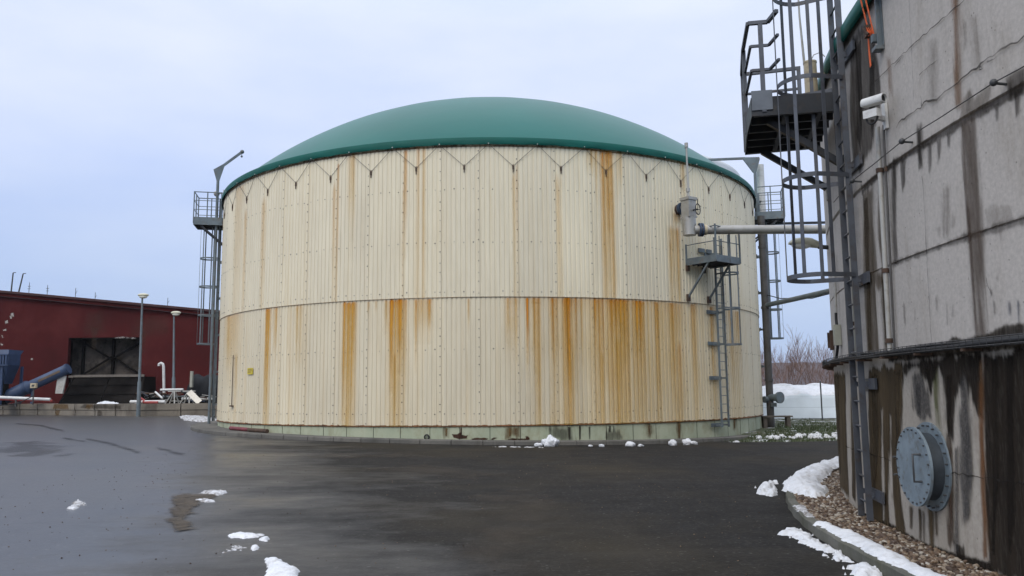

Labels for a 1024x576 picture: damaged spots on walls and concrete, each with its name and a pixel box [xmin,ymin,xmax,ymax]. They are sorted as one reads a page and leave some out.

corrosion [266,310,277,377]
corrosion [343,302,354,384]
corrosion [390,299,402,349]
corrosion [552,298,576,384]
corrosion [594,299,658,354]
leakage [850,20,1024,576]
leakage [834,371,855,500]